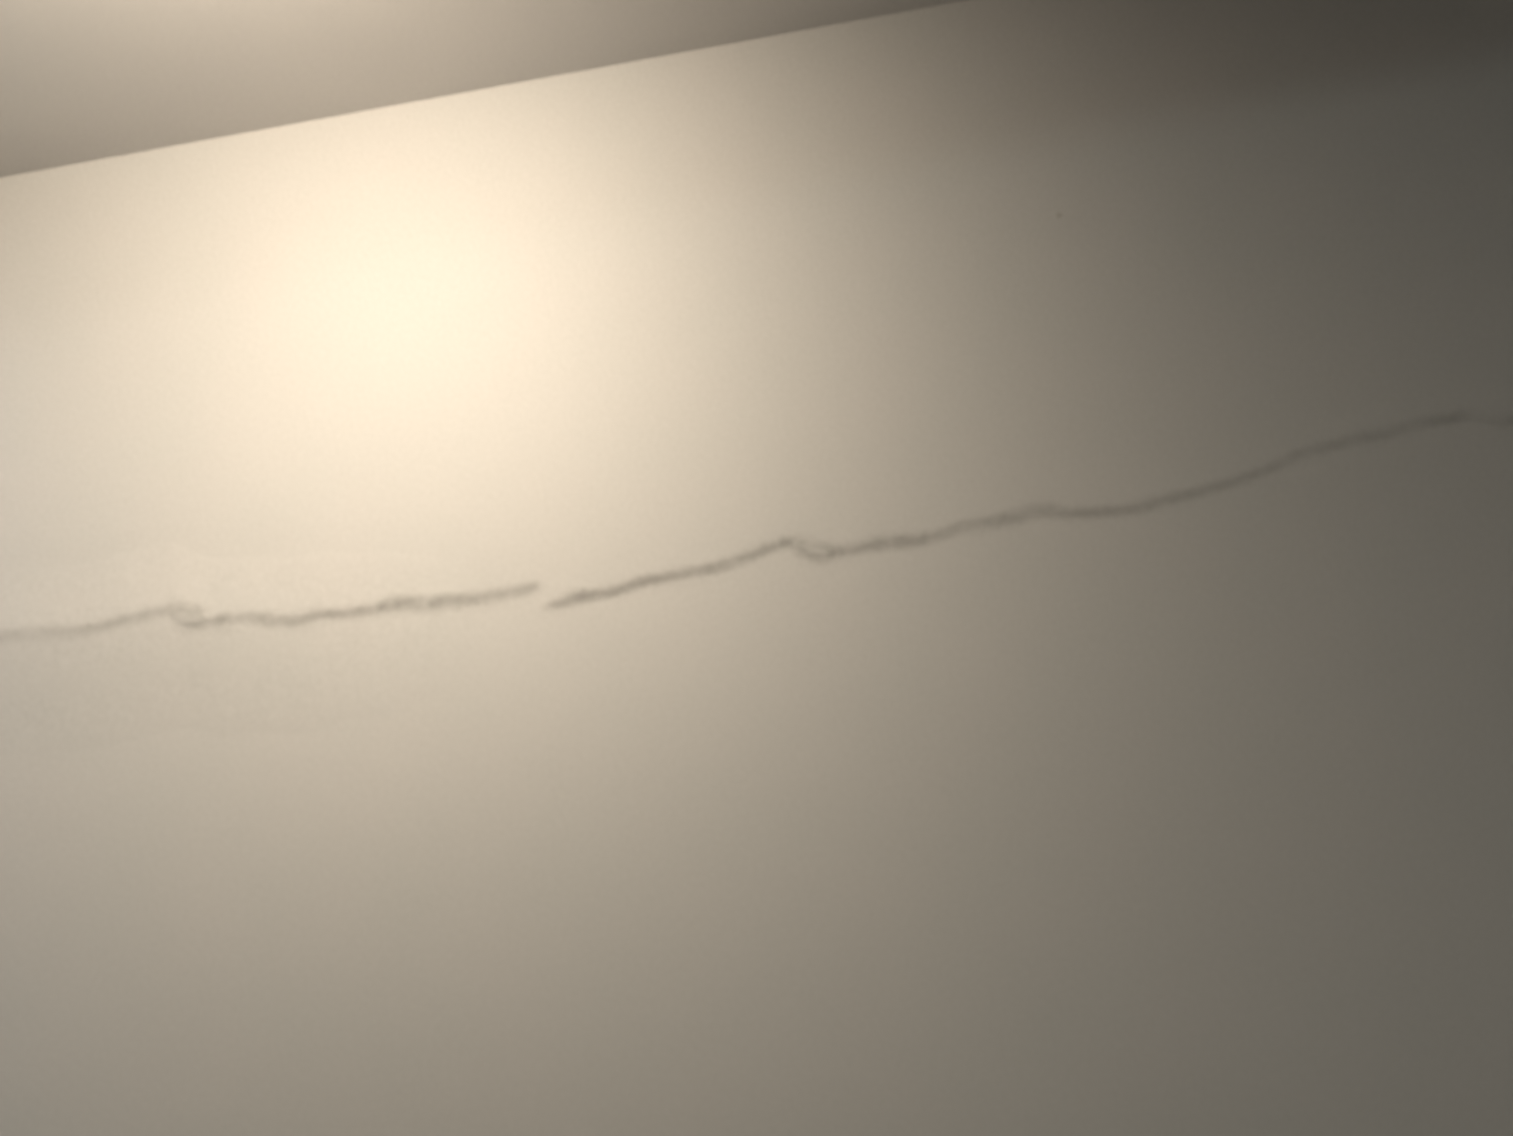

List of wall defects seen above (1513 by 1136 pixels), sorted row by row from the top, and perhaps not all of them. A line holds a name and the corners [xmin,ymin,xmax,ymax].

crack [169,607,208,627]